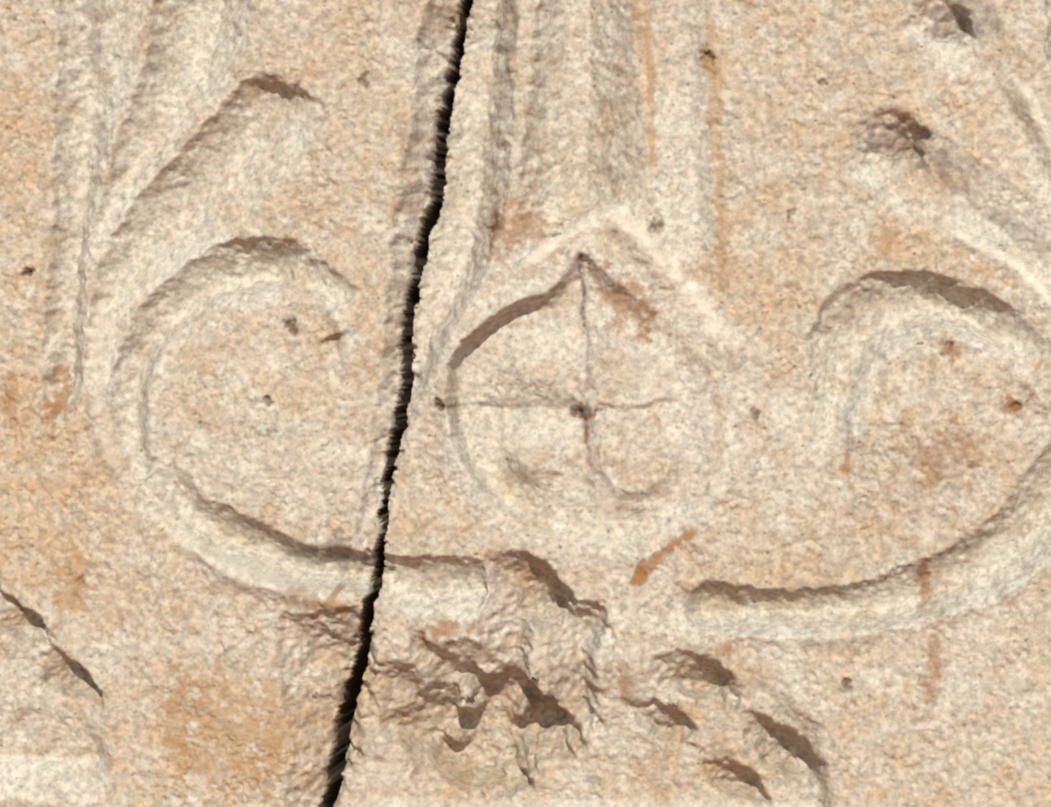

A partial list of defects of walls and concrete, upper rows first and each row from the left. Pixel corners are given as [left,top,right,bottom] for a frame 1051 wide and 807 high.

crack [323,0,474,807]
spalling [275,606,367,807]
spalling [366,550,606,788]
spalling [628,651,729,732]
spalling [701,759,759,788]
spalling [743,709,811,770]